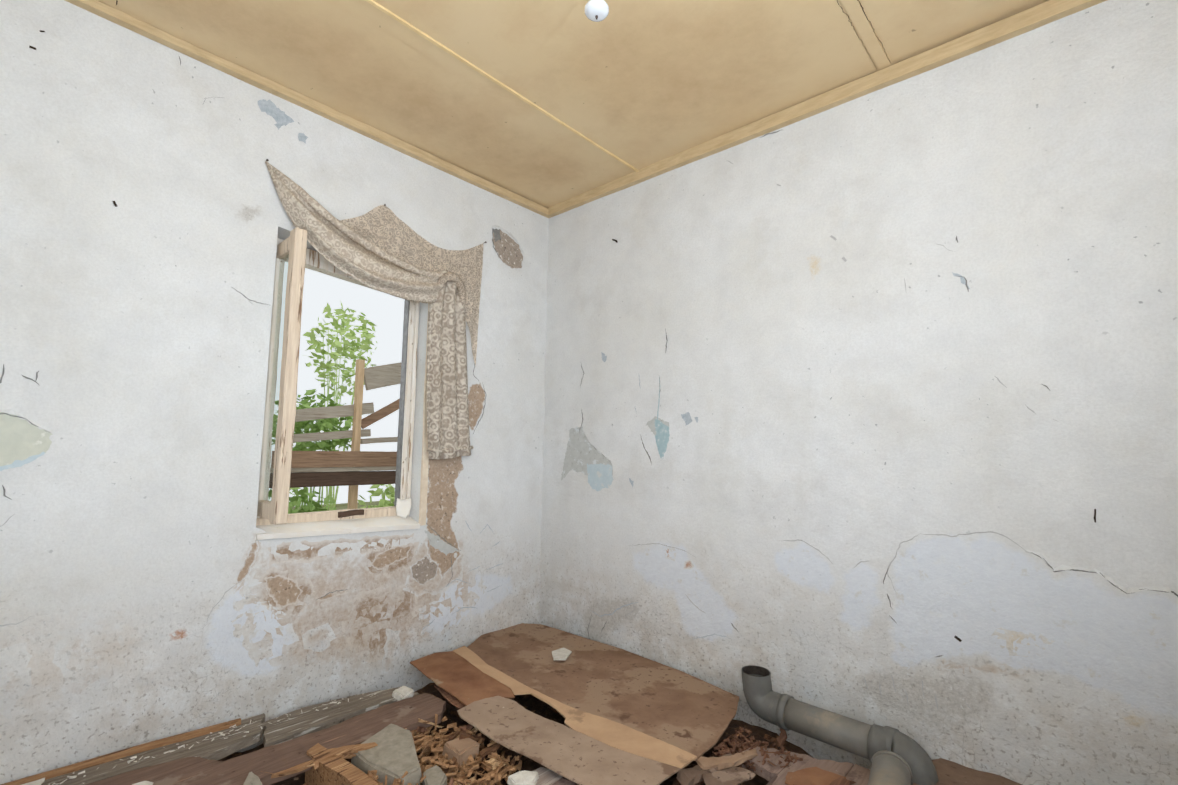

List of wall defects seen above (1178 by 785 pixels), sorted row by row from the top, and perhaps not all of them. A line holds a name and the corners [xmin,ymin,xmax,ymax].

peeling [258,99,308,143]
flaking render [491,225,525,269]
crack [0,364,39,385]
peeling [0,409,54,471]
peeling [468,363,486,432]
peeling [561,410,613,491]
peeling [641,377,670,465]
peeling [681,412,698,425]
peeling [198,527,347,683]